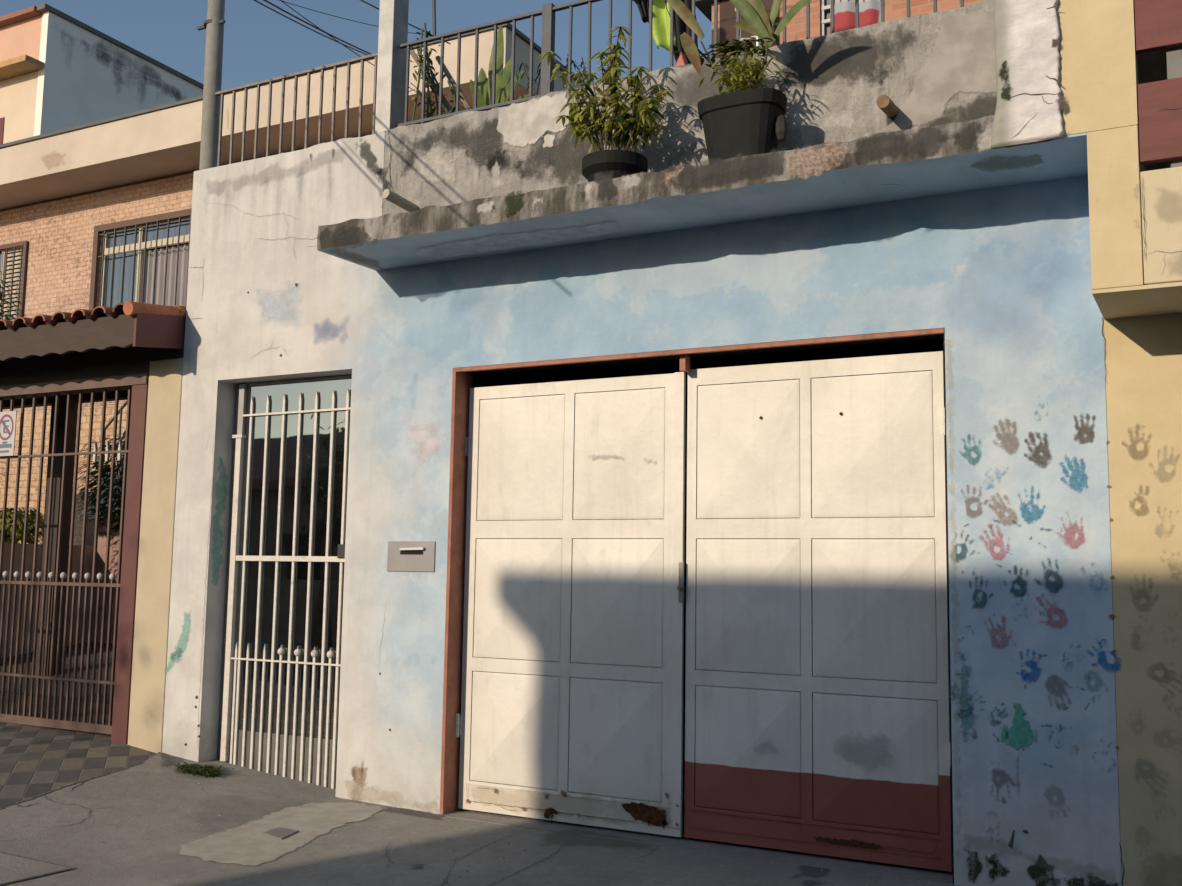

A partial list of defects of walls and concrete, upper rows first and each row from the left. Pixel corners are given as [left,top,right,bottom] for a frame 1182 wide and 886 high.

damp [96,44,180,99]
flaking render [497,91,570,148]
damp [400,119,616,218]
crack [441,787,635,886]
rust [544,790,567,822]
rust [622,793,679,830]
damp [965,849,1010,883]
damp [1027,855,1119,886]